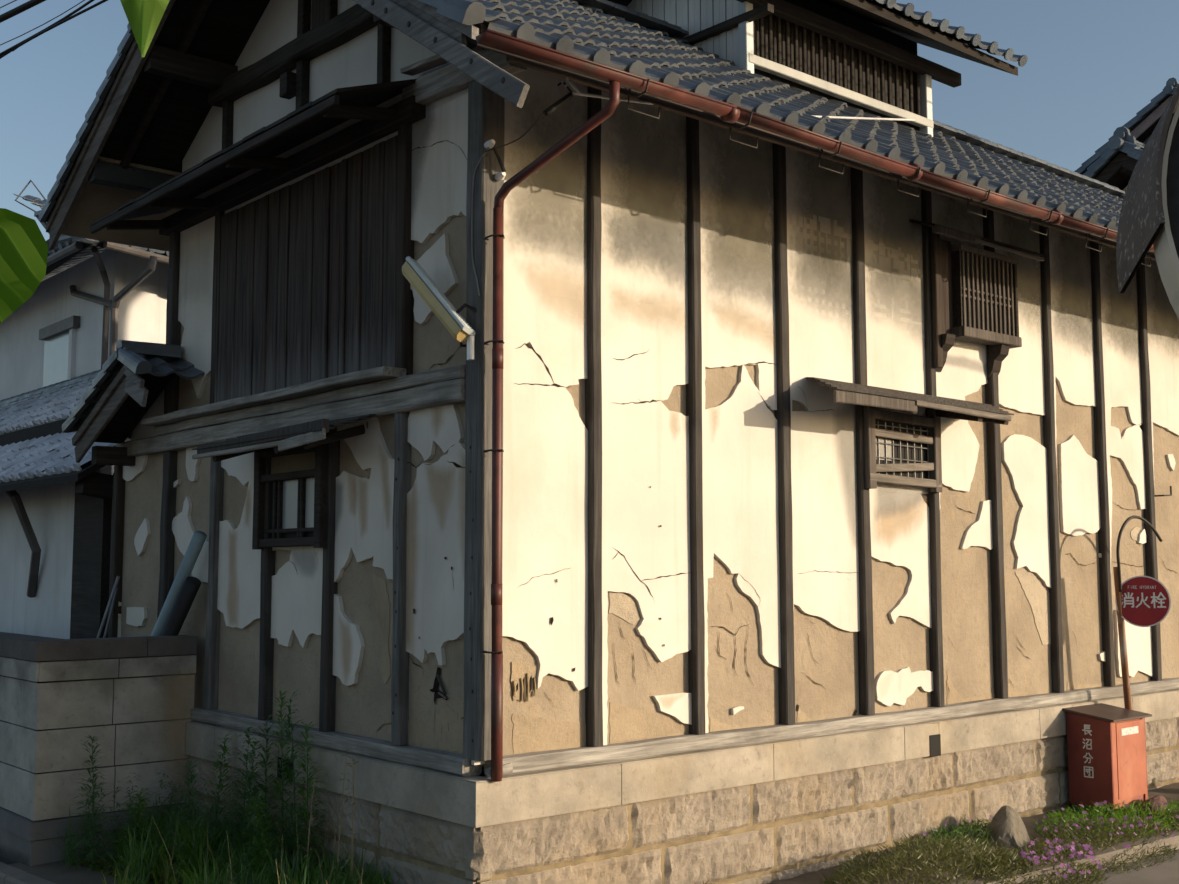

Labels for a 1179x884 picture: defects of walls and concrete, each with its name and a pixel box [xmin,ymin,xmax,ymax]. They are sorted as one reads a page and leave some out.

leakage [517,110,587,233]
leakage [617,116,688,259]
leakage [713,133,775,270]
leakage [1057,233,1093,327]
leakage [1105,250,1179,345]
crack [515,343,569,388]
spalling [121,447,260,717]
crack [613,549,686,603]
spalling [872,380,1179,713]
spalling [502,636,587,755]
spalling [607,591,692,744]
spalling [794,605,861,723]